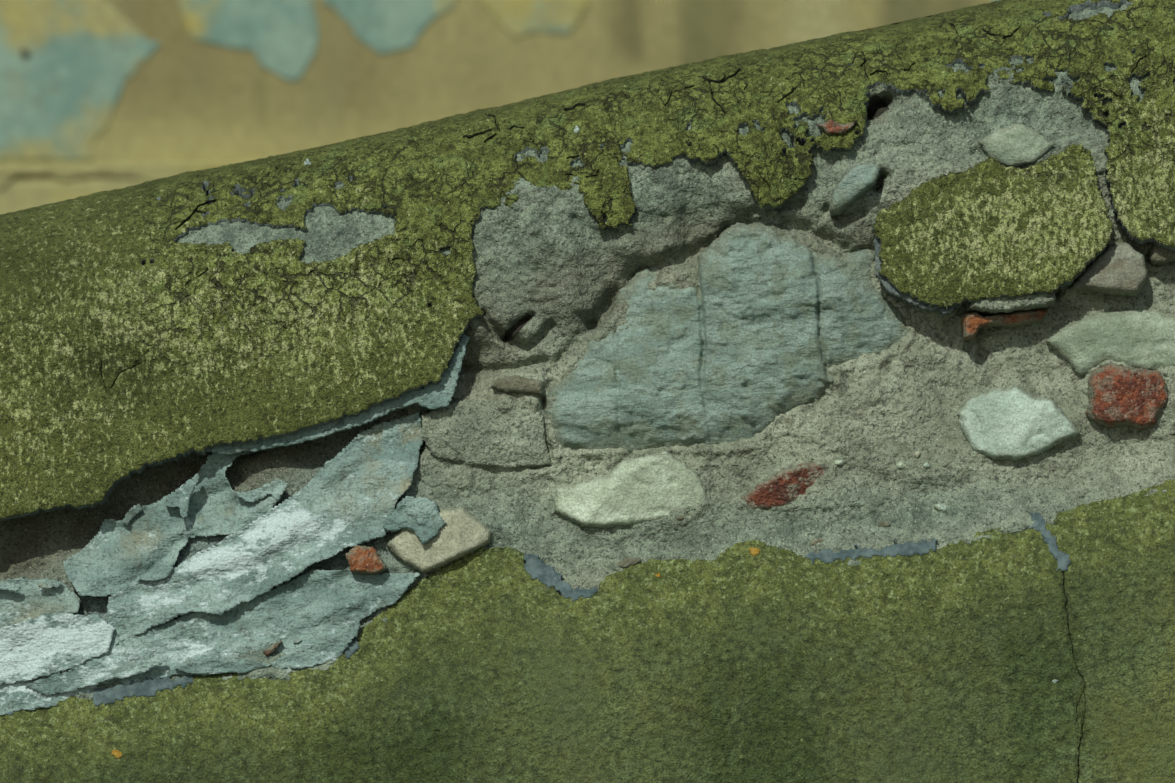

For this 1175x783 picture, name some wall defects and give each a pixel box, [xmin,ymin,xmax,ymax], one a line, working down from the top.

peeling [0,0,184,181]
peeling [178,0,457,82]
peeling [479,0,590,40]
spalling [358,71,1175,601]
flaking render [0,334,470,716]
crack [1063,571,1086,783]